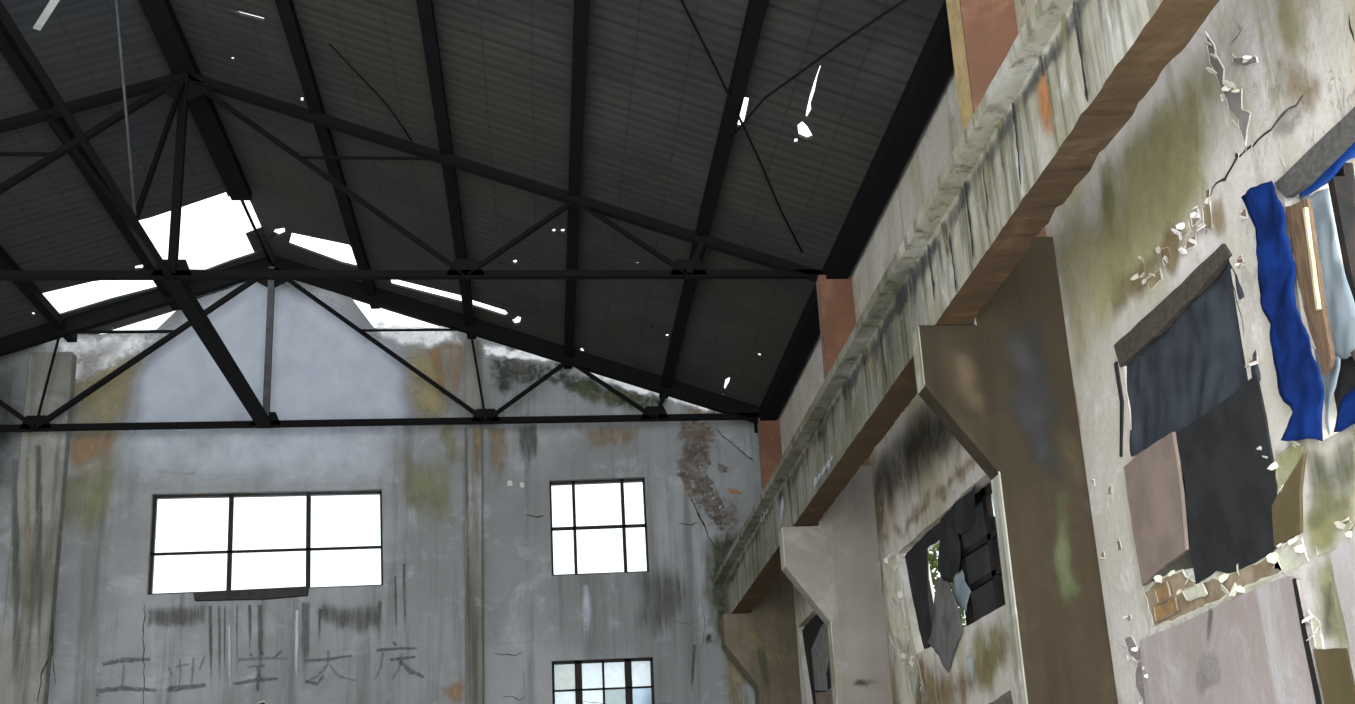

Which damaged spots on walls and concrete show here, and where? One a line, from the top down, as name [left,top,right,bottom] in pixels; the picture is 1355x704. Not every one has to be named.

damp [983,2,1081,193]
peeling [1204,31,1259,147]
crack [1205,94,1304,235]
peeling [1130,197,1213,291]
peeling [1229,254,1245,333]
damp [691,184,967,684]
peeling [1256,441,1305,495]
damp [150,605,262,673]
damp [295,564,406,667]
peeling [1119,614,1148,704]
spalling [1144,517,1355,627]
peeling [1302,609,1325,649]